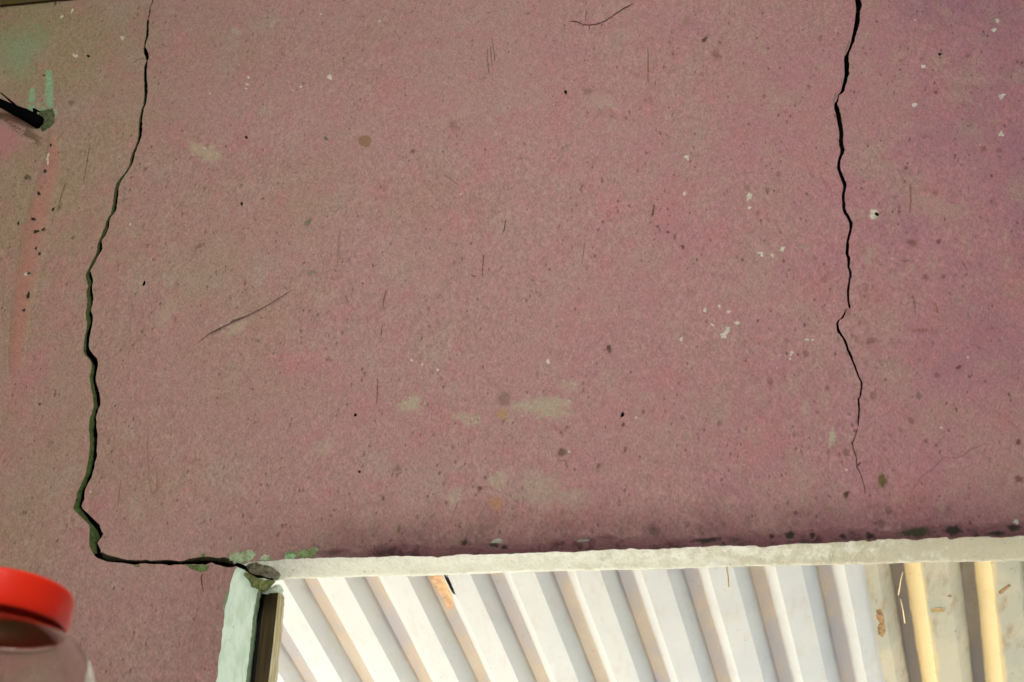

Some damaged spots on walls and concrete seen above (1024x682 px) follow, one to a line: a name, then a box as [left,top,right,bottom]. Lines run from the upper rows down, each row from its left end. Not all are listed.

crack [74,0,273,592]
crack [833,0,866,495]